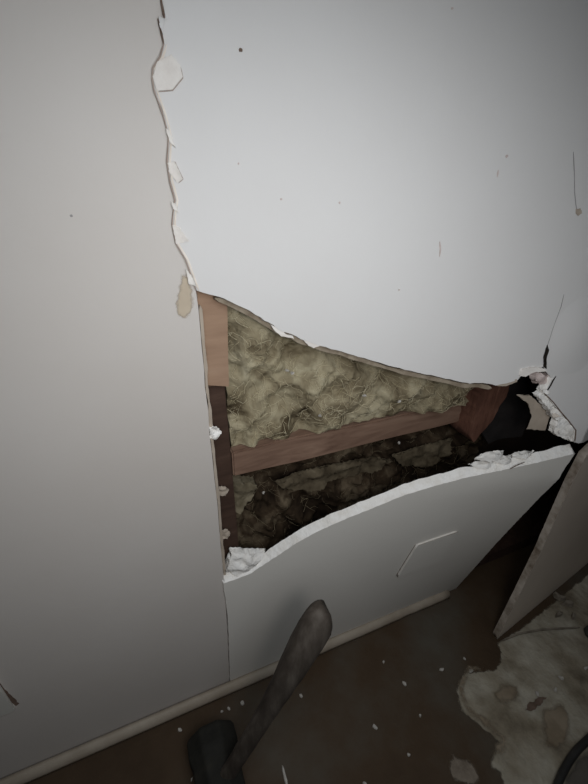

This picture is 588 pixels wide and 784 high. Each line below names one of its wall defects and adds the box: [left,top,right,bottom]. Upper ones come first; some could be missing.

crack [151,0,199,291]
spalling [496,345,577,441]